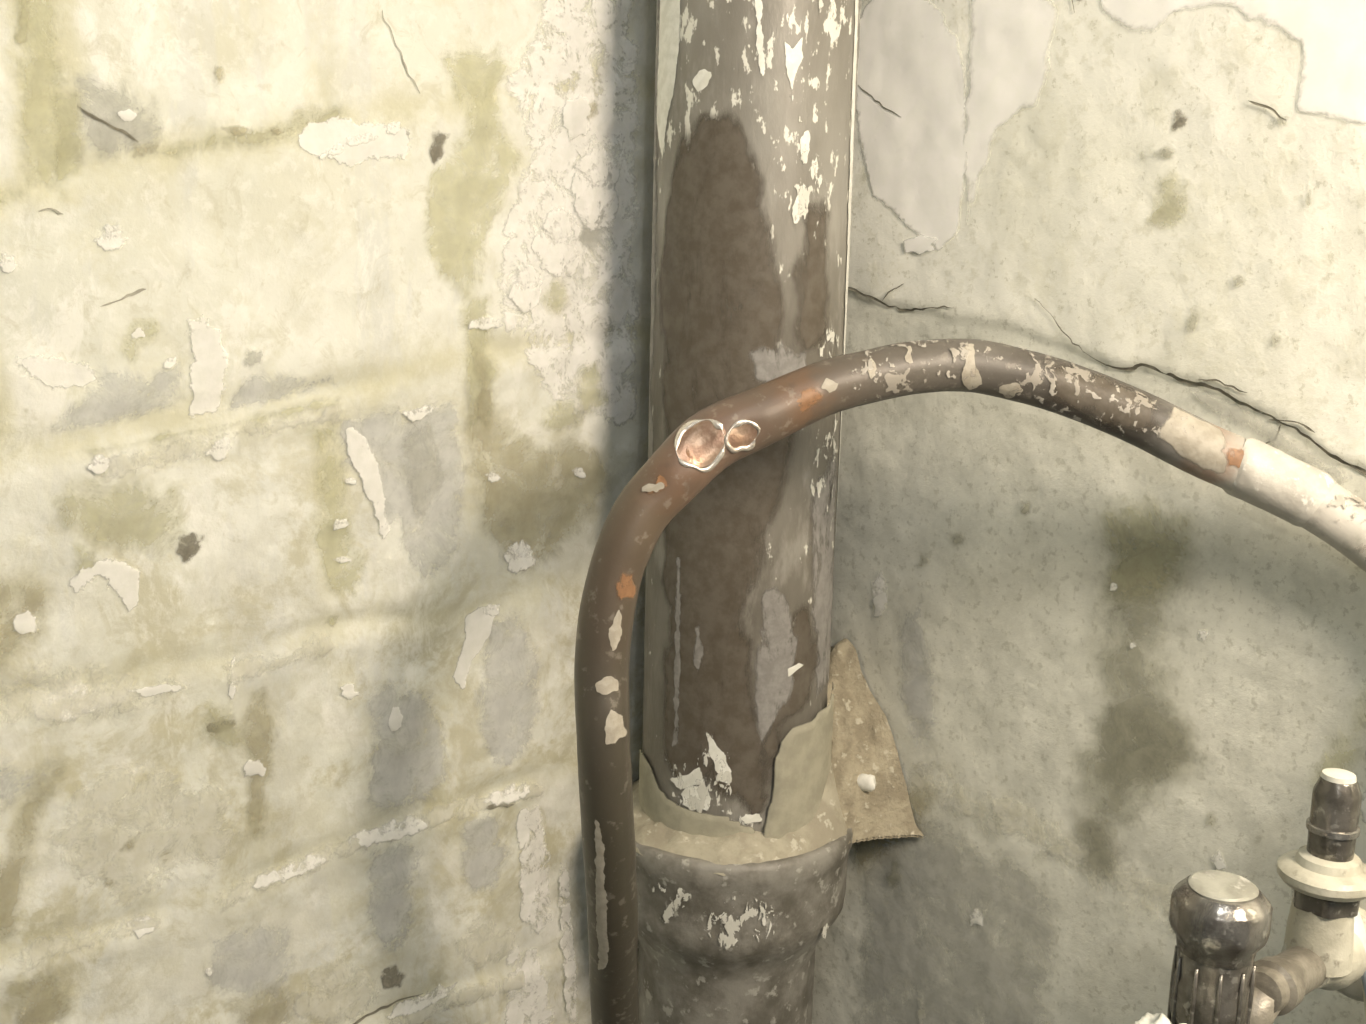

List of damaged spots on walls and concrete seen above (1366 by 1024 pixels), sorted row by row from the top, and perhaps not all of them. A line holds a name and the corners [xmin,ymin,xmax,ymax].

peeling [469,0,640,429]
crack [848,284,949,312]
spalling [177,533,203,561]
peeling [341,405,463,574]
damp [468,308,604,573]
crack [1035,299,1366,476]
damp [0,585,43,650]
damp [213,700,270,820]
peeling [453,604,500,689]
damp [1083,517,1189,876]
damp [0,803,37,933]
spalling [353,966,423,1024]